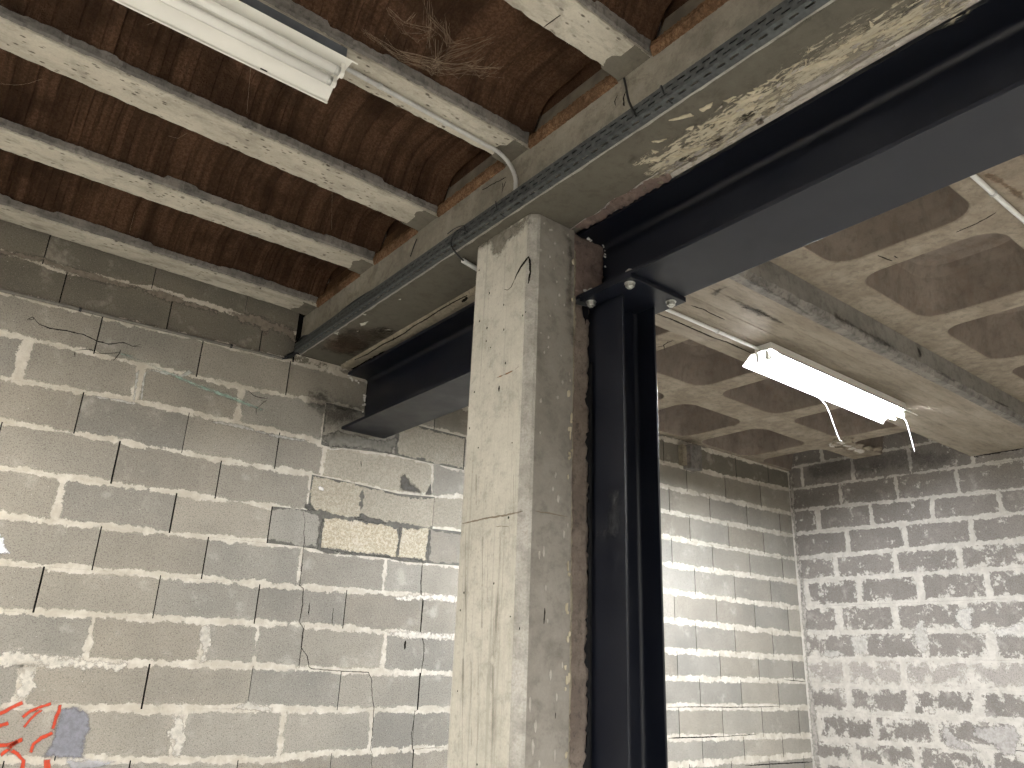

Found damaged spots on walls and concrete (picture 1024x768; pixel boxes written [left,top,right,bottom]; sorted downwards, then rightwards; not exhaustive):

peeling [633,0,970,191]
crack [29,317,141,360]
crack [298,509,374,765]